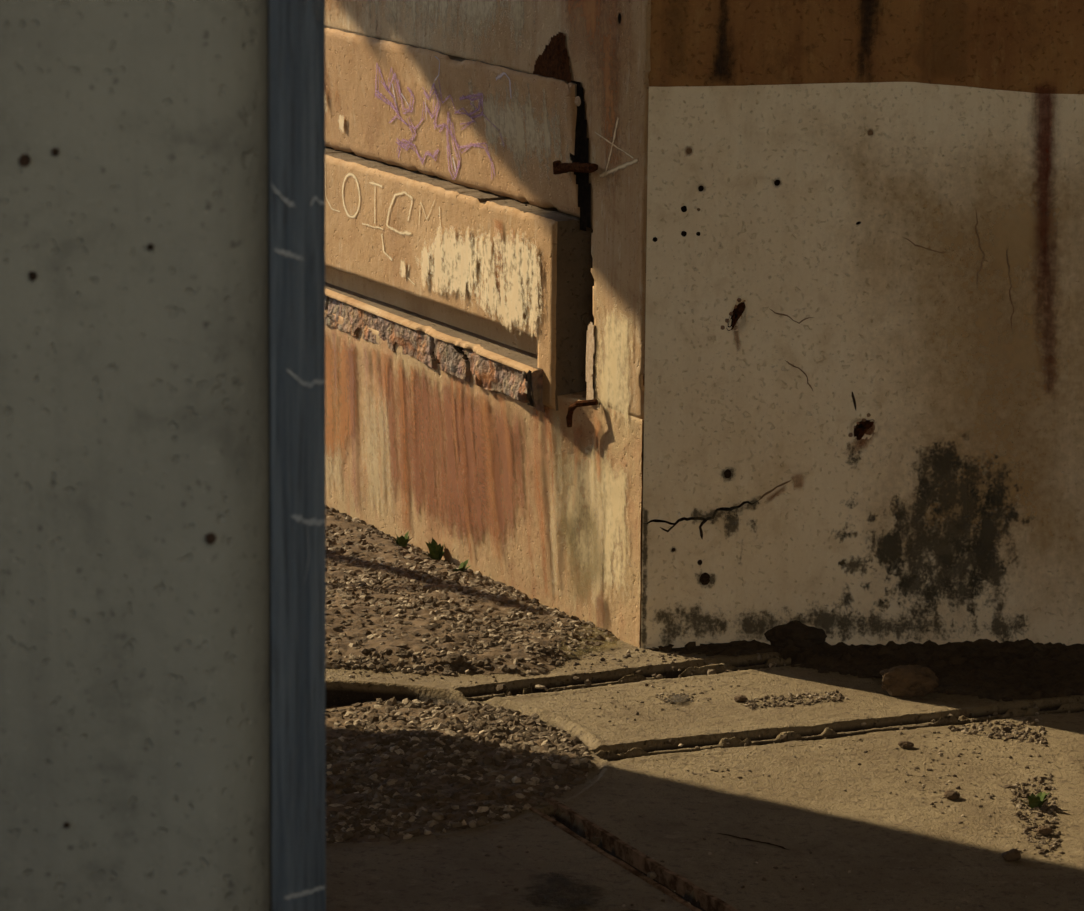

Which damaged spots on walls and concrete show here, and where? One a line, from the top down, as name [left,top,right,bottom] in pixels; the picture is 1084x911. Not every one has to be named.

spalling [533,32,571,83]
damp [714,0,731,80]
damp [859,0,879,75]
peeling [421,226,542,336]
hole [721,298,746,348]
rust [325,335,357,463]
damp [596,313,633,424]
hole [848,392,875,449]
damp [641,183,1083,647]
damp [551,421,629,628]
crack [648,480,791,539]